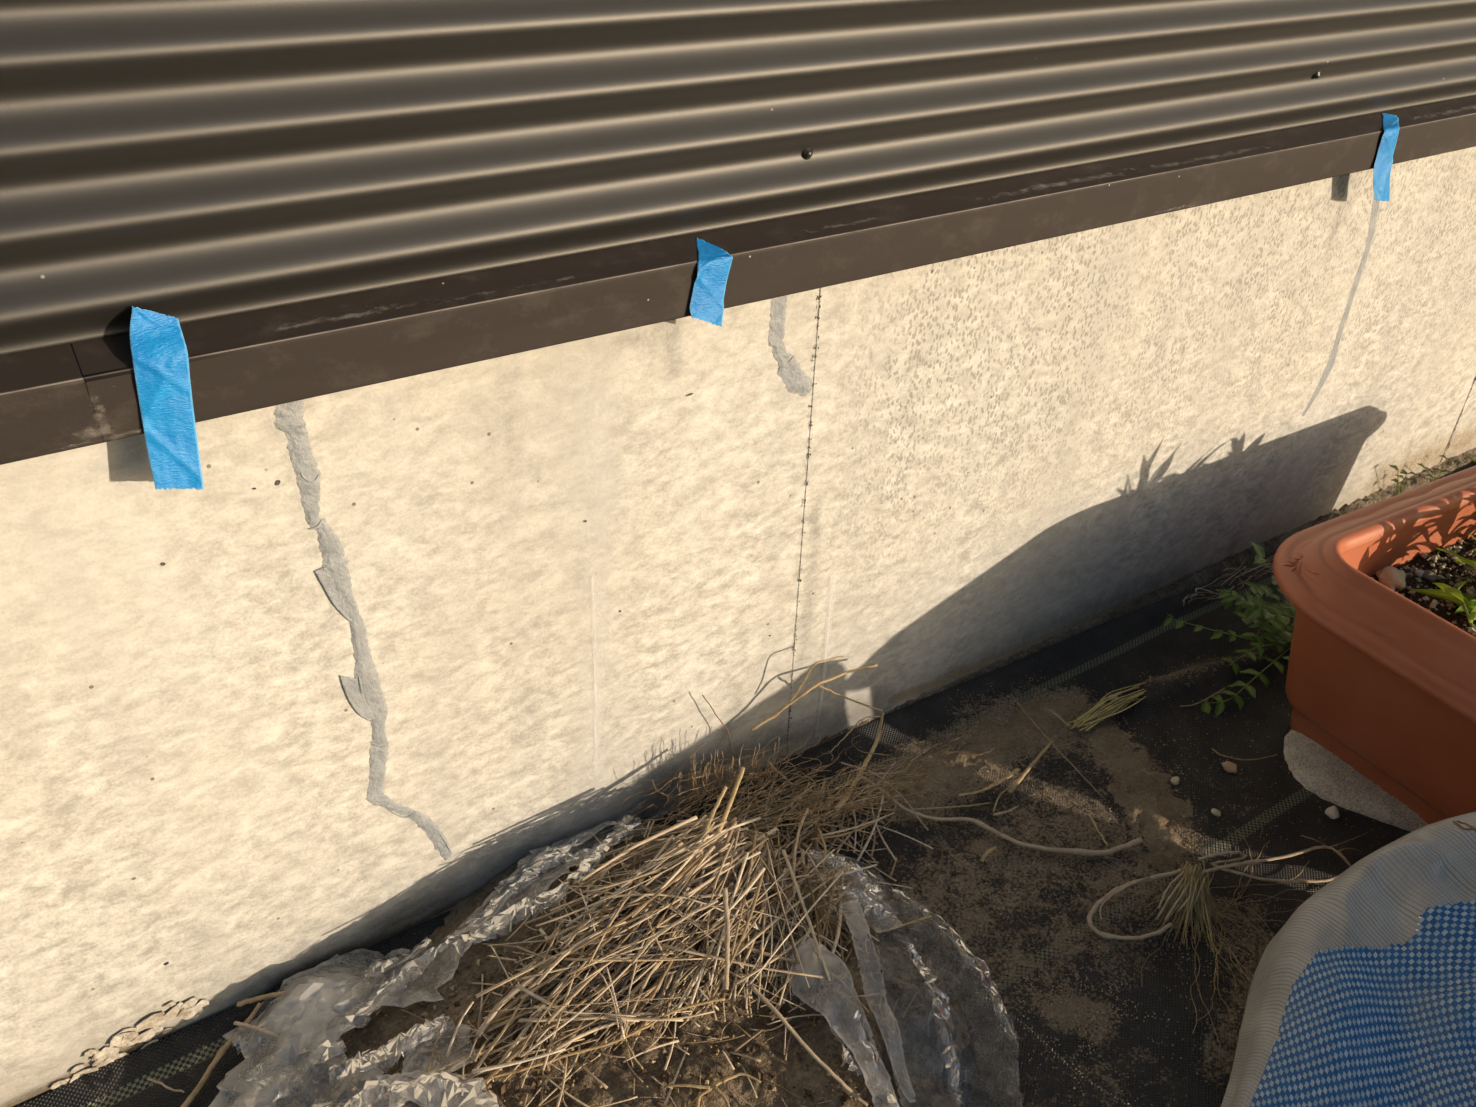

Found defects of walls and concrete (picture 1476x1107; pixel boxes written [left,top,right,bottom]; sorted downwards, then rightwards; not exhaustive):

crack [273,399,453,860]
crack [768,289,822,742]
crack [1302,197,1380,417]